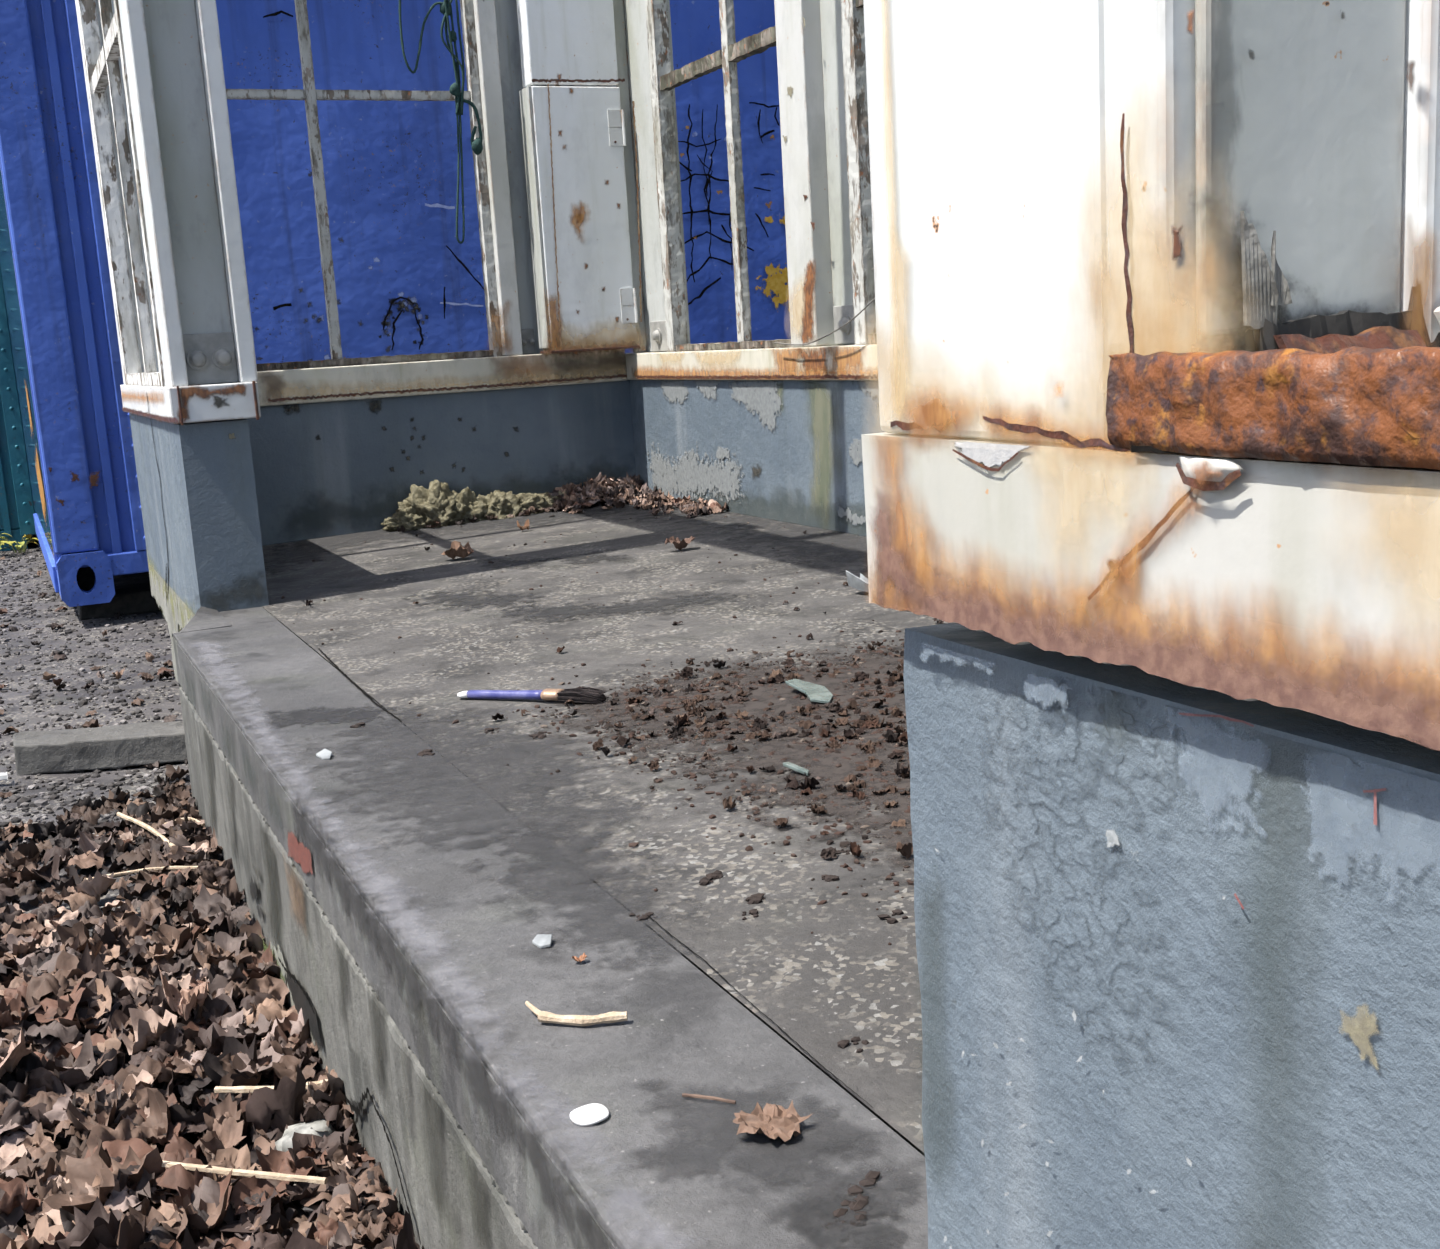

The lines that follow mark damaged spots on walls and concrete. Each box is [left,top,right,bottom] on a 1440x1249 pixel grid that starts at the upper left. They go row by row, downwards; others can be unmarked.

rust [260,261,878,402]
rust [122,384,246,424]
peeling [661,380,783,434]
peeling [857,380,879,406]
peeling [647,442,745,507]
peeling [849,438,863,466]
peeling [837,505,866,525]
rust [874,437,1440,751]